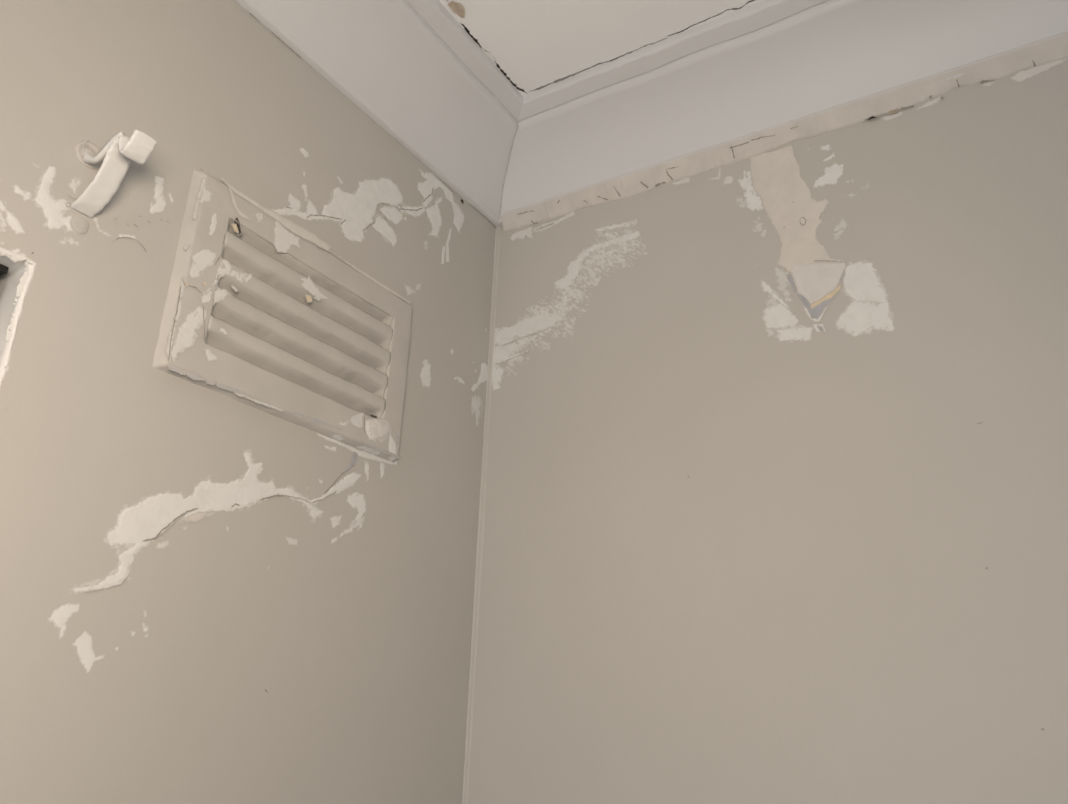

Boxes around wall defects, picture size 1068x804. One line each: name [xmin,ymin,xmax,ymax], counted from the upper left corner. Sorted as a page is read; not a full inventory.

crack [446,0,755,94]
spalling [232,217,242,236]
crack [285,121,677,427]
crack [730,126,798,159]
flaking render [749,145,846,332]
crack [68,415,401,596]